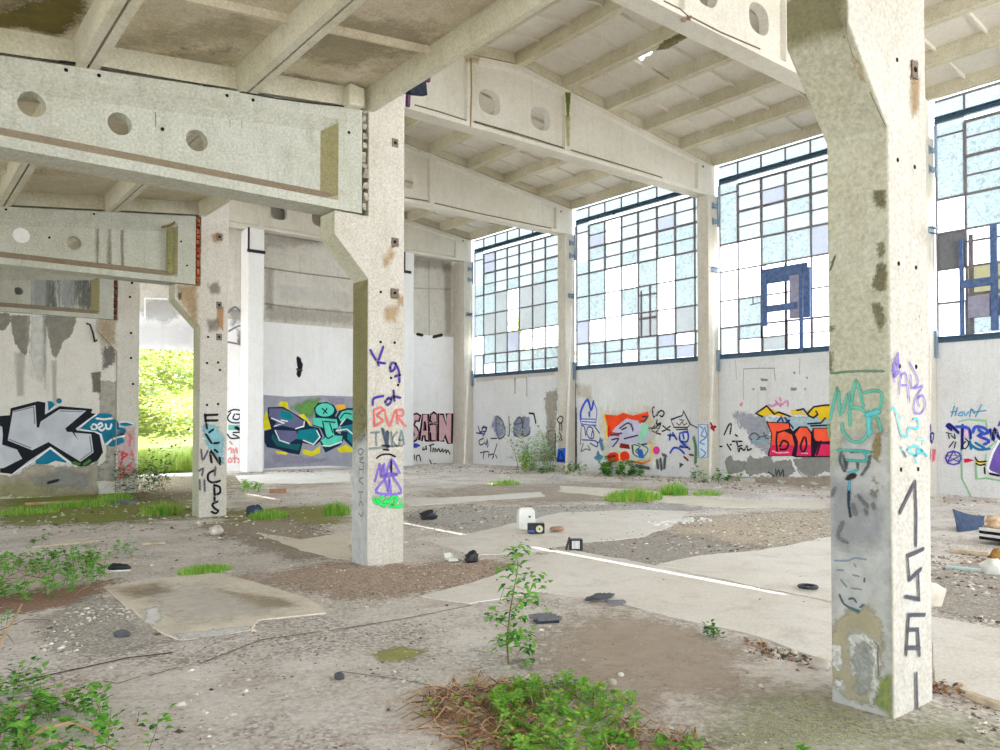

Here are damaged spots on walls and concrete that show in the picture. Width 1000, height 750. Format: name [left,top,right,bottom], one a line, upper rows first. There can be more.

rust [910,61,918,112]
rust [386,289,404,319]
spalling [832,606,892,716]